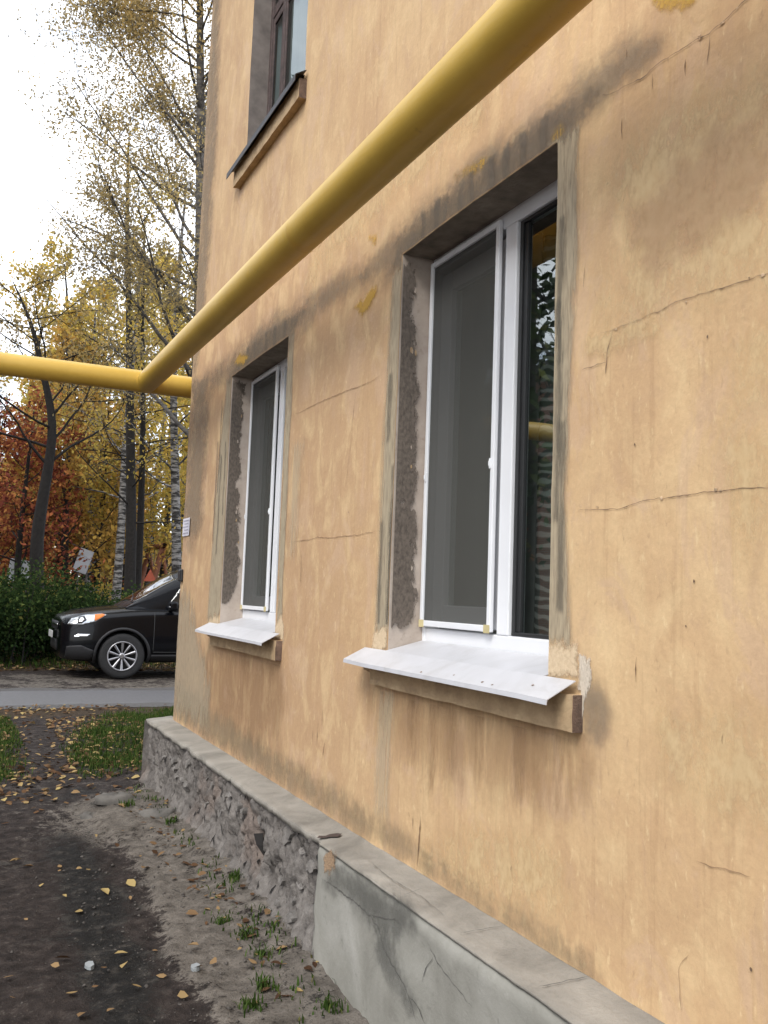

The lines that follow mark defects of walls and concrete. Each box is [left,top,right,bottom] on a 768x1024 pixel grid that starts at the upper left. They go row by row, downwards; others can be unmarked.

crack [603,0,745,95]
water stain [360,45,656,647]
crack [584,273,768,374]
peeling [222,380,246,603]
peeling [391,263,420,629]
crack [580,487,764,510]
crack [297,833,472,1022]